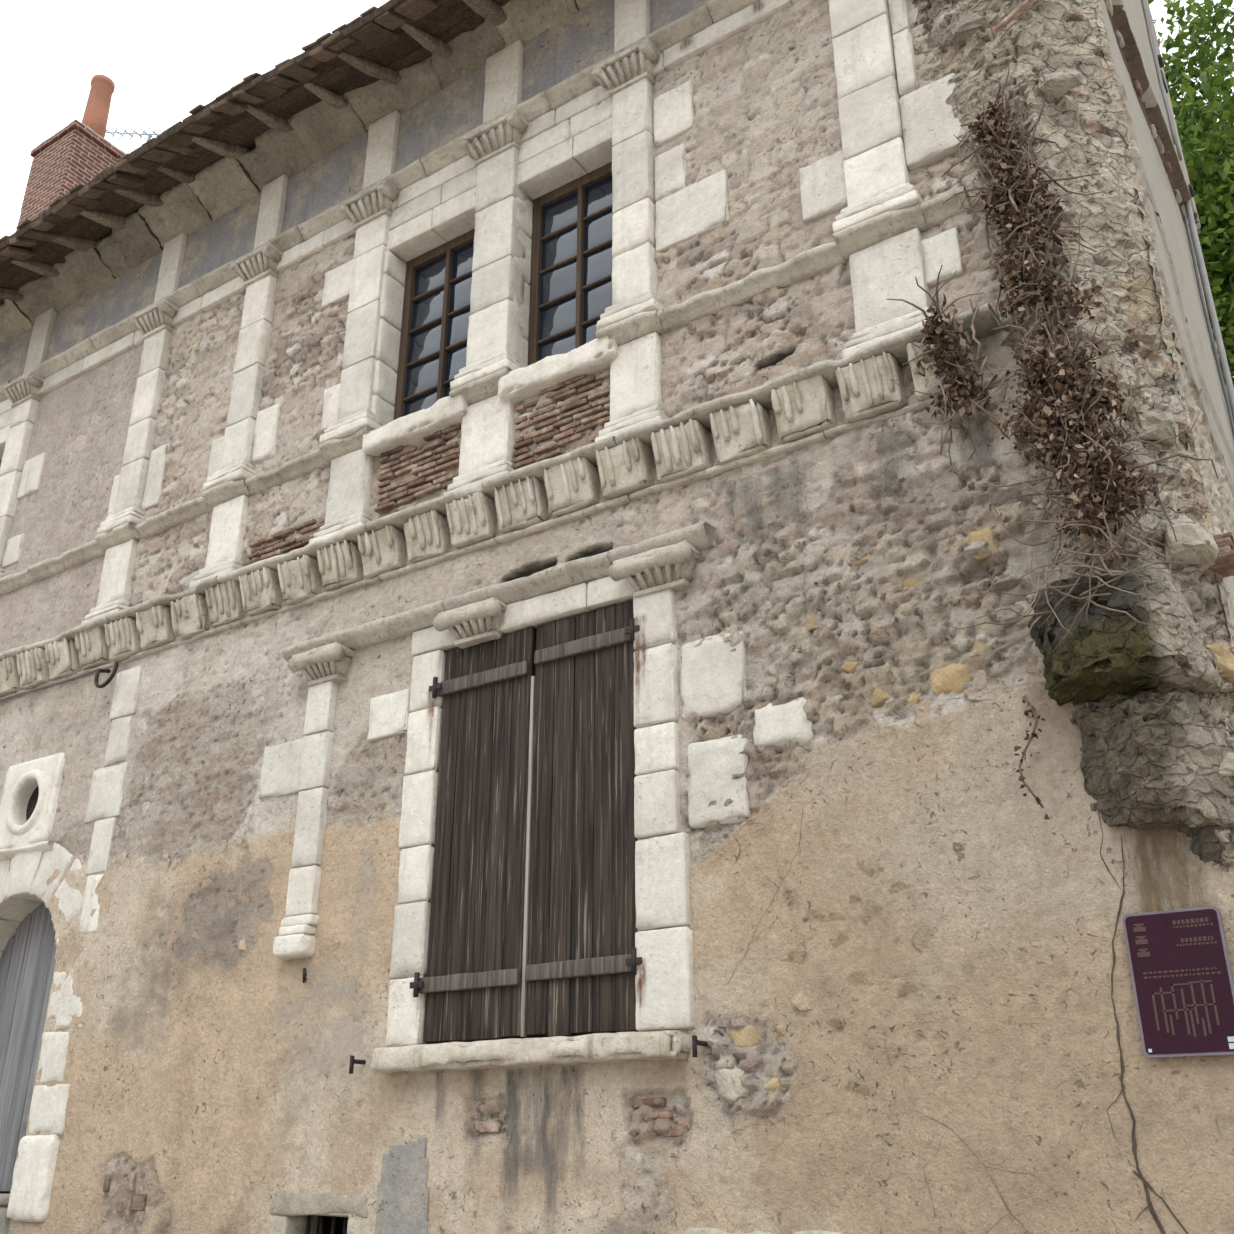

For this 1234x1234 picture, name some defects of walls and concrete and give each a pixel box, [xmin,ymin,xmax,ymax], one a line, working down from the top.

spalling [676,0,1234,877]
leakage [505,1074,562,1209]
spalling [617,1007,806,1158]
crack [1098,810,1189,1234]